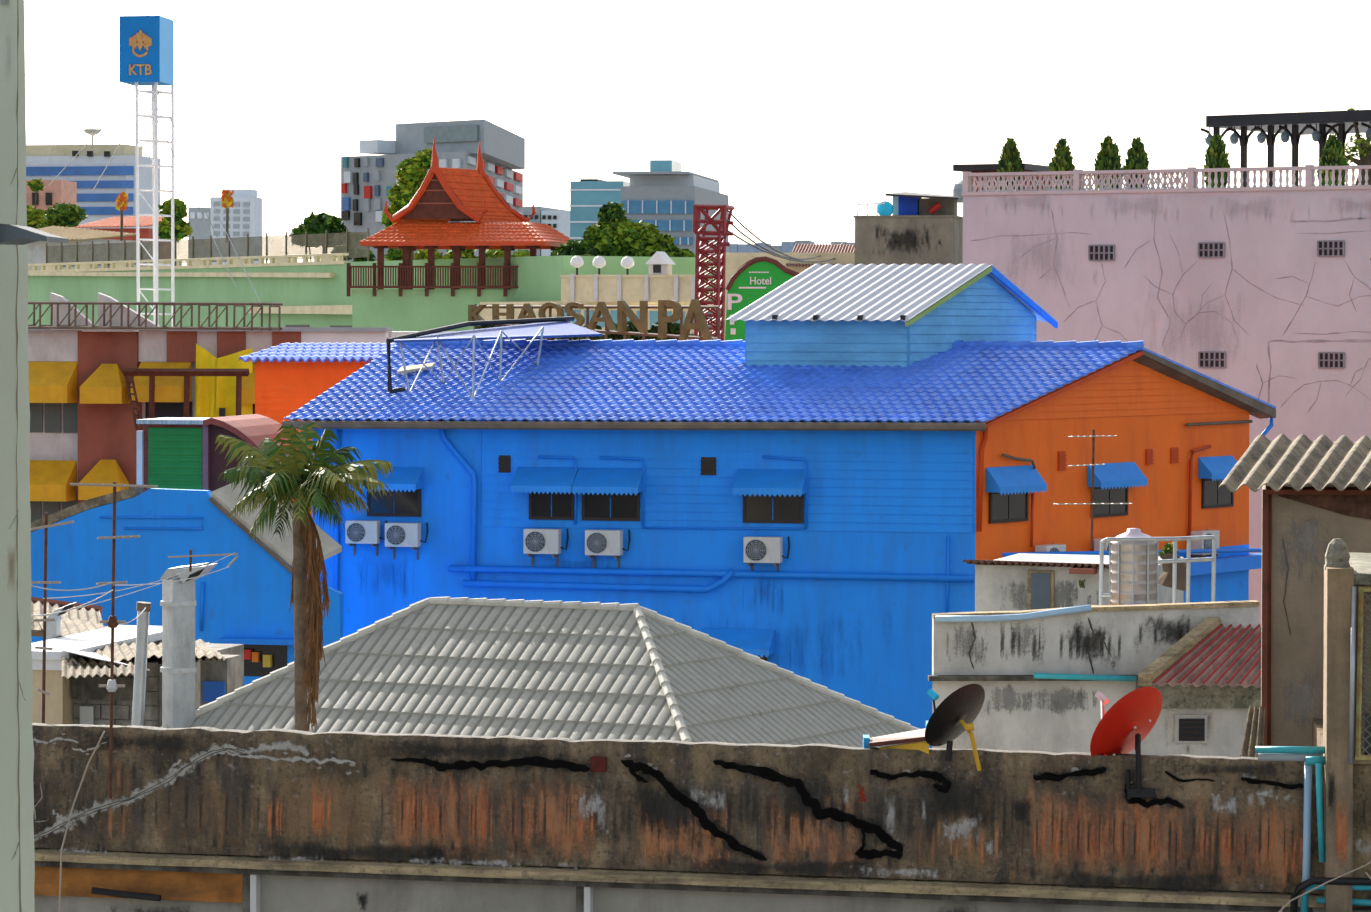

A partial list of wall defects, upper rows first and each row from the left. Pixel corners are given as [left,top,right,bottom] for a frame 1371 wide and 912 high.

water stain [876,228,940,251]
crack [972,209,1371,414]
water stain [947,626,1121,664]
water stain [1139,619,1189,643]
water stain [274,842,506,866]
corrosion [393,779,593,857]
crack [391,754,767,861]
corrosion [639,807,730,863]
crack [713,760,903,860]
corrosion [771,803,858,865]
corrosion [1029,794,1303,885]
crack [1033,766,1304,809]